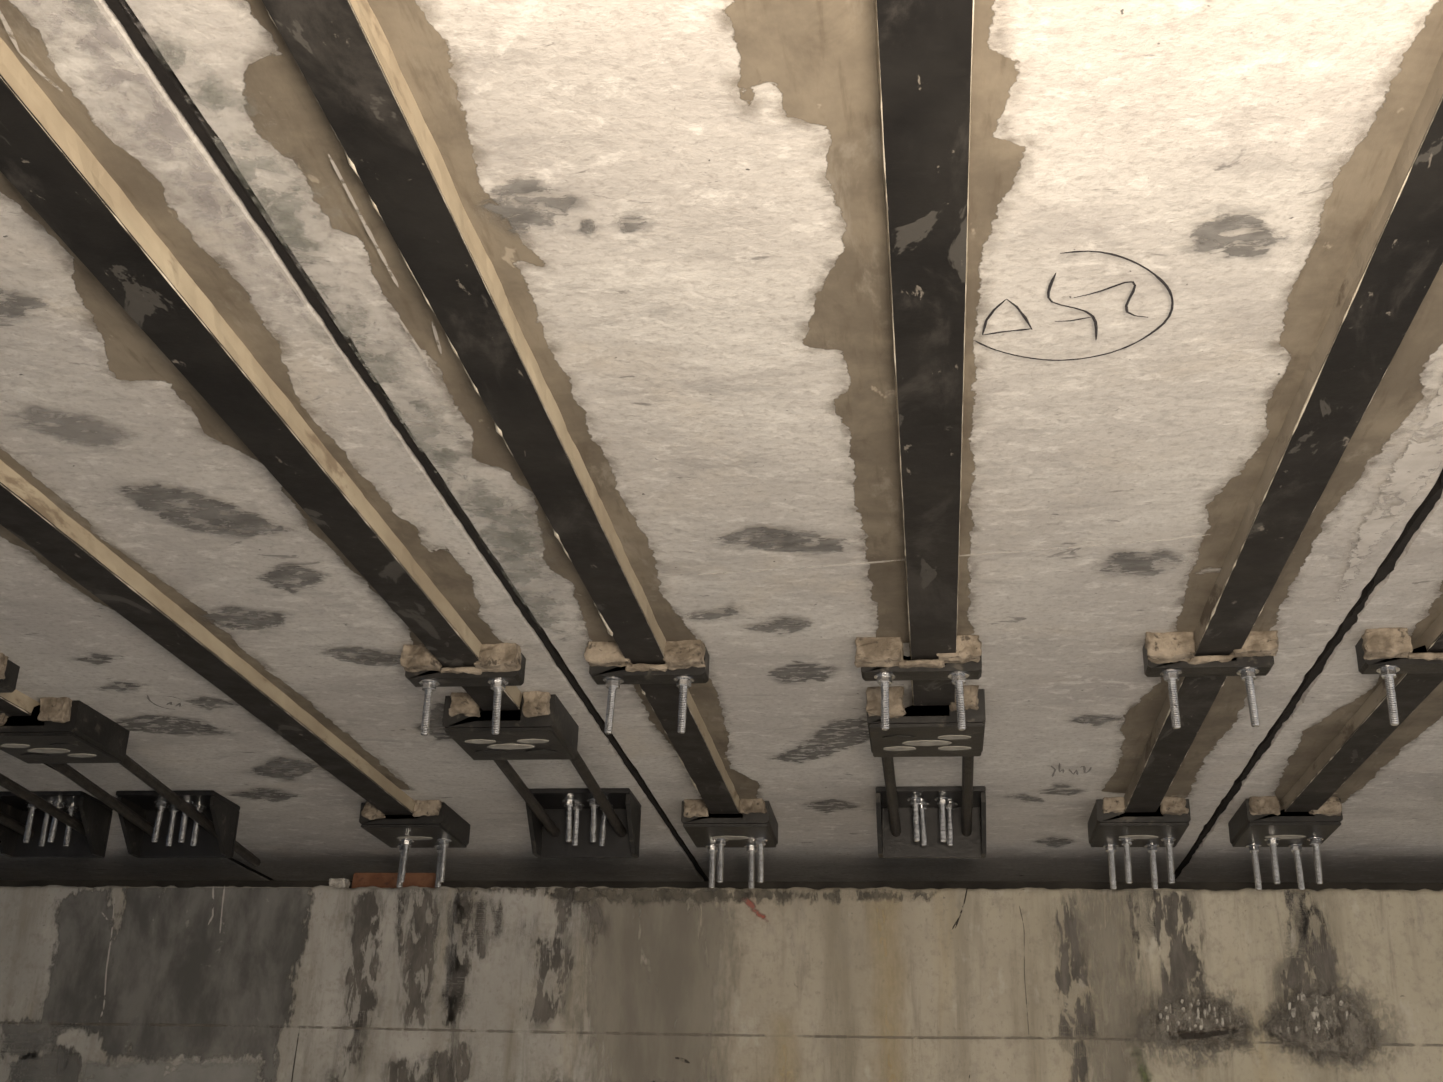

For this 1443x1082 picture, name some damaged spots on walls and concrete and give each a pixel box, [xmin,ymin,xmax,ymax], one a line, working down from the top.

leakage [1,887,314,1082]
leakage [330,887,933,1082]
spalling [1138,983,1387,1065]